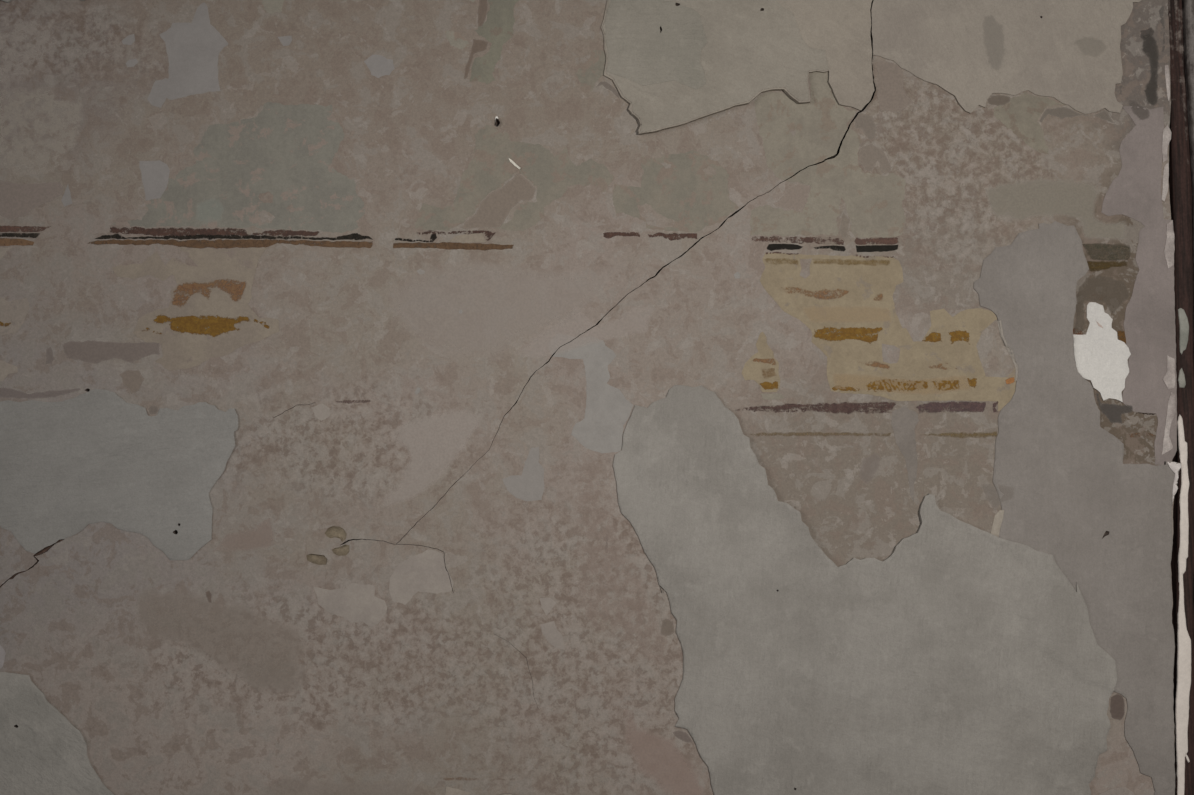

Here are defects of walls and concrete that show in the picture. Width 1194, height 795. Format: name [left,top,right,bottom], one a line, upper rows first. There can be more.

crack [0,539,64,587]
flaking render [46,341,159,394]
crack [341,0,876,593]
flaking render [598,0,1189,795]